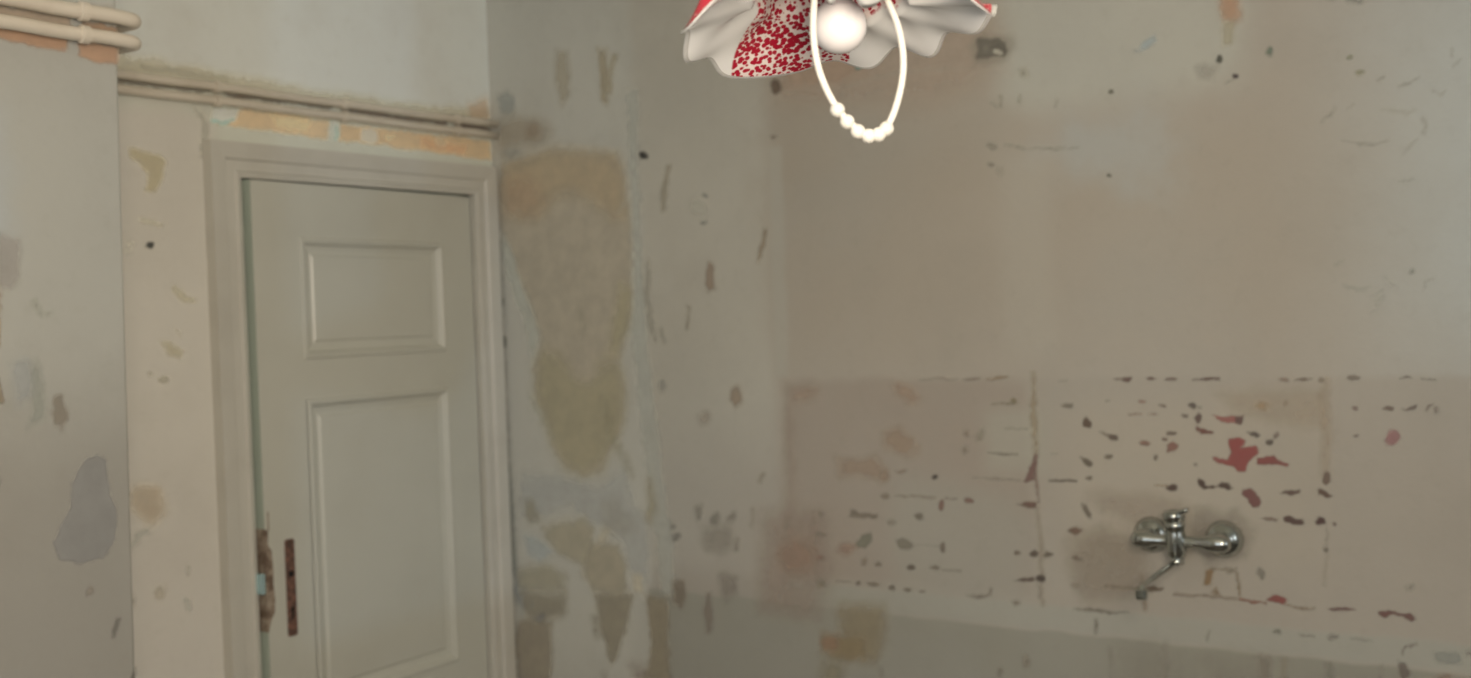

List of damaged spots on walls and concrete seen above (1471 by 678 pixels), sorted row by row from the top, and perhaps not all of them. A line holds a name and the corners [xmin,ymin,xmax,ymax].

peeling [212,108,491,160]
peeling [54,455,117,564]
flaking render [516,502,671,678]
peeling [851,510,924,592]
peeling [1140,403,1336,526]